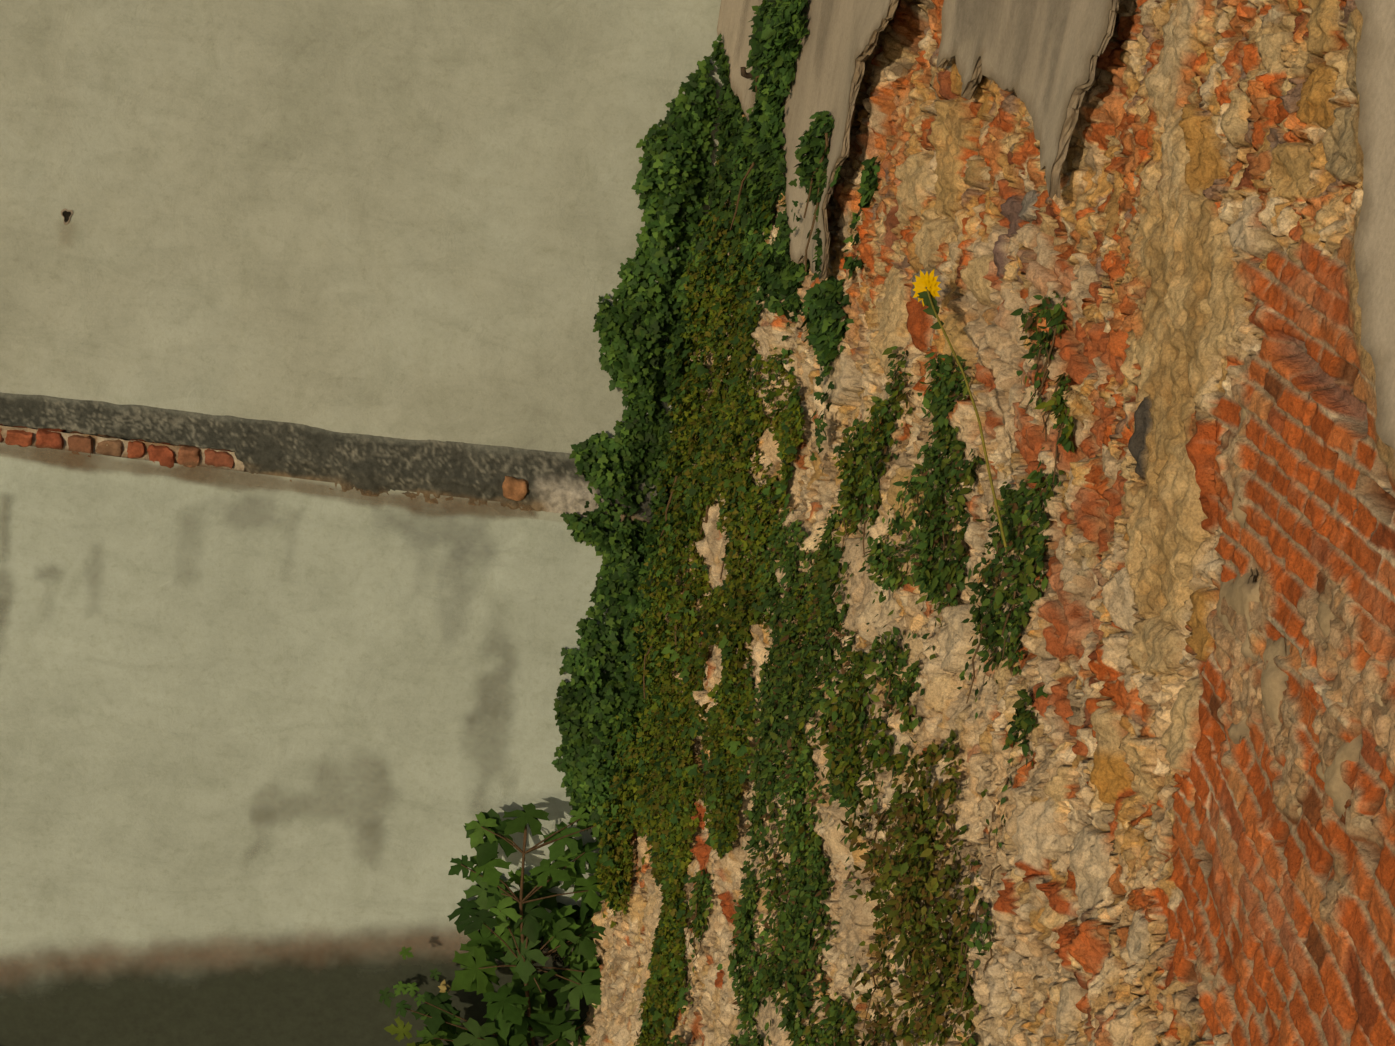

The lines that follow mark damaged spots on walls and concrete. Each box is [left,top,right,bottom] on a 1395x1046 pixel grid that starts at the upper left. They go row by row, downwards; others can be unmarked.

spalling [0,424,244,472]
spalling [570,0,1395,1046]
damp [0,949,514,1046]
damp [524,941,589,1046]